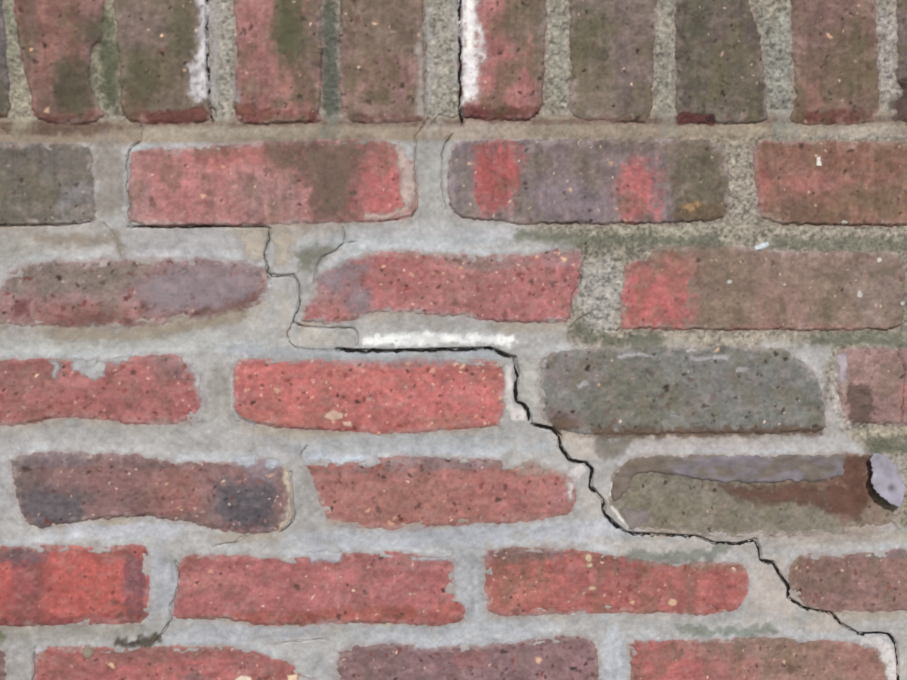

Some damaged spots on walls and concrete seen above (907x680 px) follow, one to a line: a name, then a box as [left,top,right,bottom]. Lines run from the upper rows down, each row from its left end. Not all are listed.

crack [361,0,463,223]
crack [125,131,899,680]
peeling [611,454,847,501]
peeling [870,453,906,507]